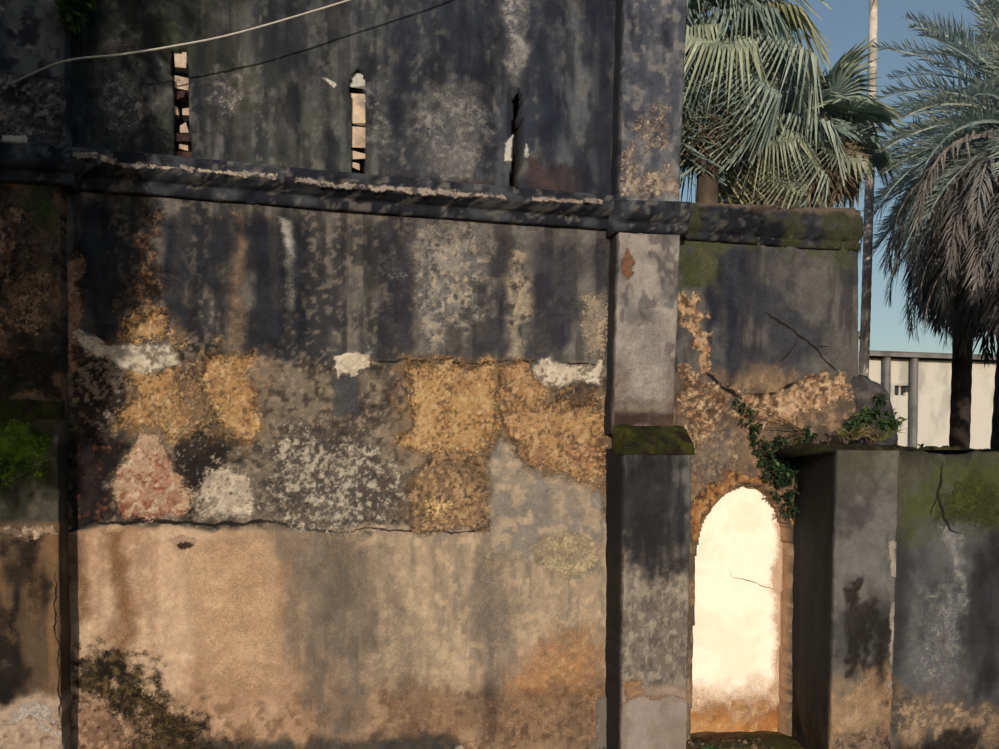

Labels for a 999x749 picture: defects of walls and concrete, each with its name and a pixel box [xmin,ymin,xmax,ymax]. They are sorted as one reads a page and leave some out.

damp [391,0,529,185]
flaking render [620,104,680,200]
damp [0,197,131,621]
damp [172,422,233,521]
damp [159,212,307,384]
flaking render [0,204,609,581]
damp [359,222,583,360]
flaking render [623,291,854,542]
crack [705,313,840,398]
crack [931,462,959,533]
damp [70,523,477,749]
damp [832,524,999,749]